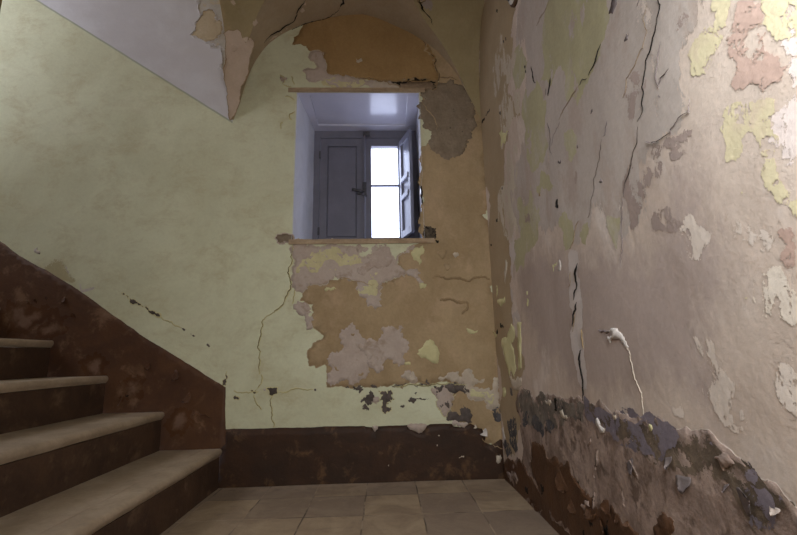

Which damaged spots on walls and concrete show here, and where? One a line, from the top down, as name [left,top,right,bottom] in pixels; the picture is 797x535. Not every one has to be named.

peeling [189,0,254,120]
crack [266,0,345,41]
crack [547,44,601,150]
crack [620,0,690,264]
peeling [651,129,693,178]
peeling [728,6,788,92]
peeling [275,0,639,535]
crack [568,122,607,401]
peeling [651,206,684,233]
crack [234,245,313,427]
peeling [653,511,675,535]
peeling [663,436,795,532]